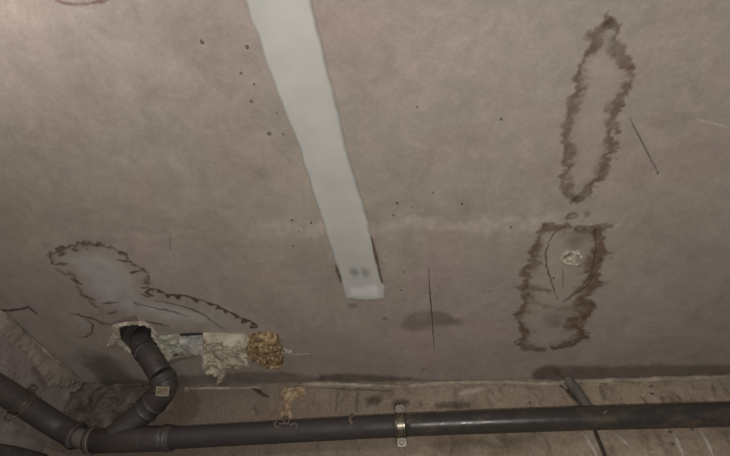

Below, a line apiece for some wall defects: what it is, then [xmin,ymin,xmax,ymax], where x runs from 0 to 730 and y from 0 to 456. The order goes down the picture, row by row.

leakage [585,16,618,56]
leakage [130,268,258,329]
leakage [513,223,585,349]
spalling [560,249,584,266]
leakage [551,229,606,350]
spalling [107,314,205,364]